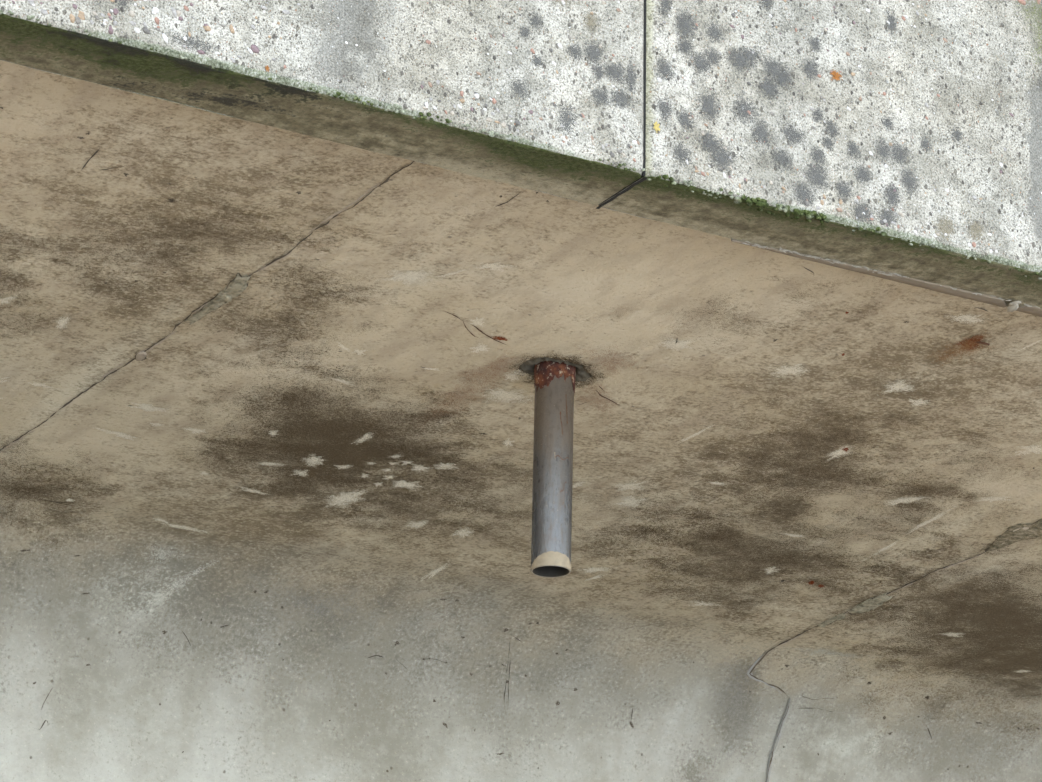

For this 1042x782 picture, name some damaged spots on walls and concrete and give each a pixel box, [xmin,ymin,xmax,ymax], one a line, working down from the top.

crack [247,161,415,277]
crack [0,292,221,453]
leakage [0,166,533,571]
leakage [530,363,1042,782]
crack [885,549,989,596]
crack [747,611,849,782]